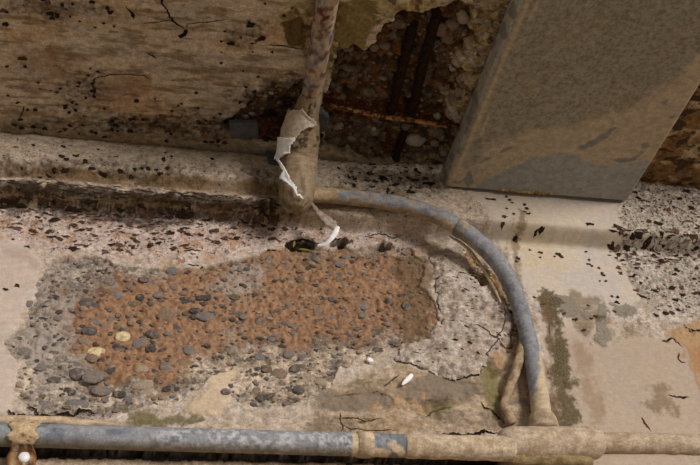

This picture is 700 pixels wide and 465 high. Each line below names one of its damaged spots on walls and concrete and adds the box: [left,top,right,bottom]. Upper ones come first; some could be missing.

crack [126,0,231,38]
peeling [281,16,306,45]
spalling [227,79,304,129]
corrosion [322,92,454,124]
spalling [320,0,510,165]
spalling [4,248,439,420]
crack [456,308,508,381]
leakage [533,288,582,426]